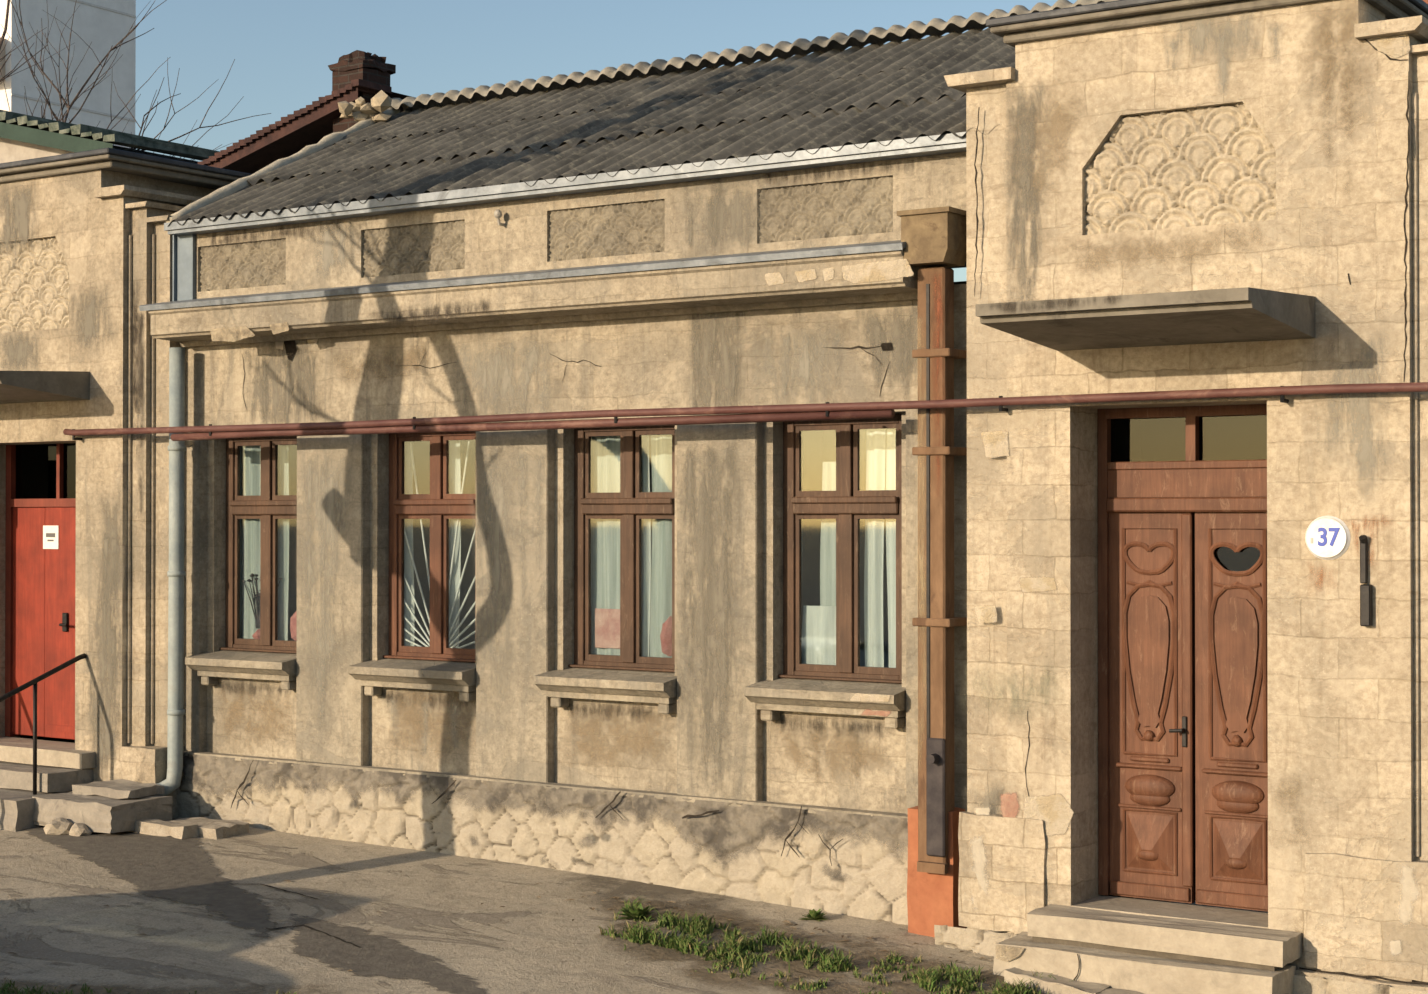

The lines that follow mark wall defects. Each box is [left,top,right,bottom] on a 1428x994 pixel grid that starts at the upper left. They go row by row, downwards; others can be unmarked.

crack [973,107,981,297]
water stain [1010,91,1070,285]
crack [821,342,893,393]
water stain [577,704,660,764]
crack [432,780,456,804]
crack [595,791,623,819]
crack [682,810,719,819]
crack [781,806,843,866]